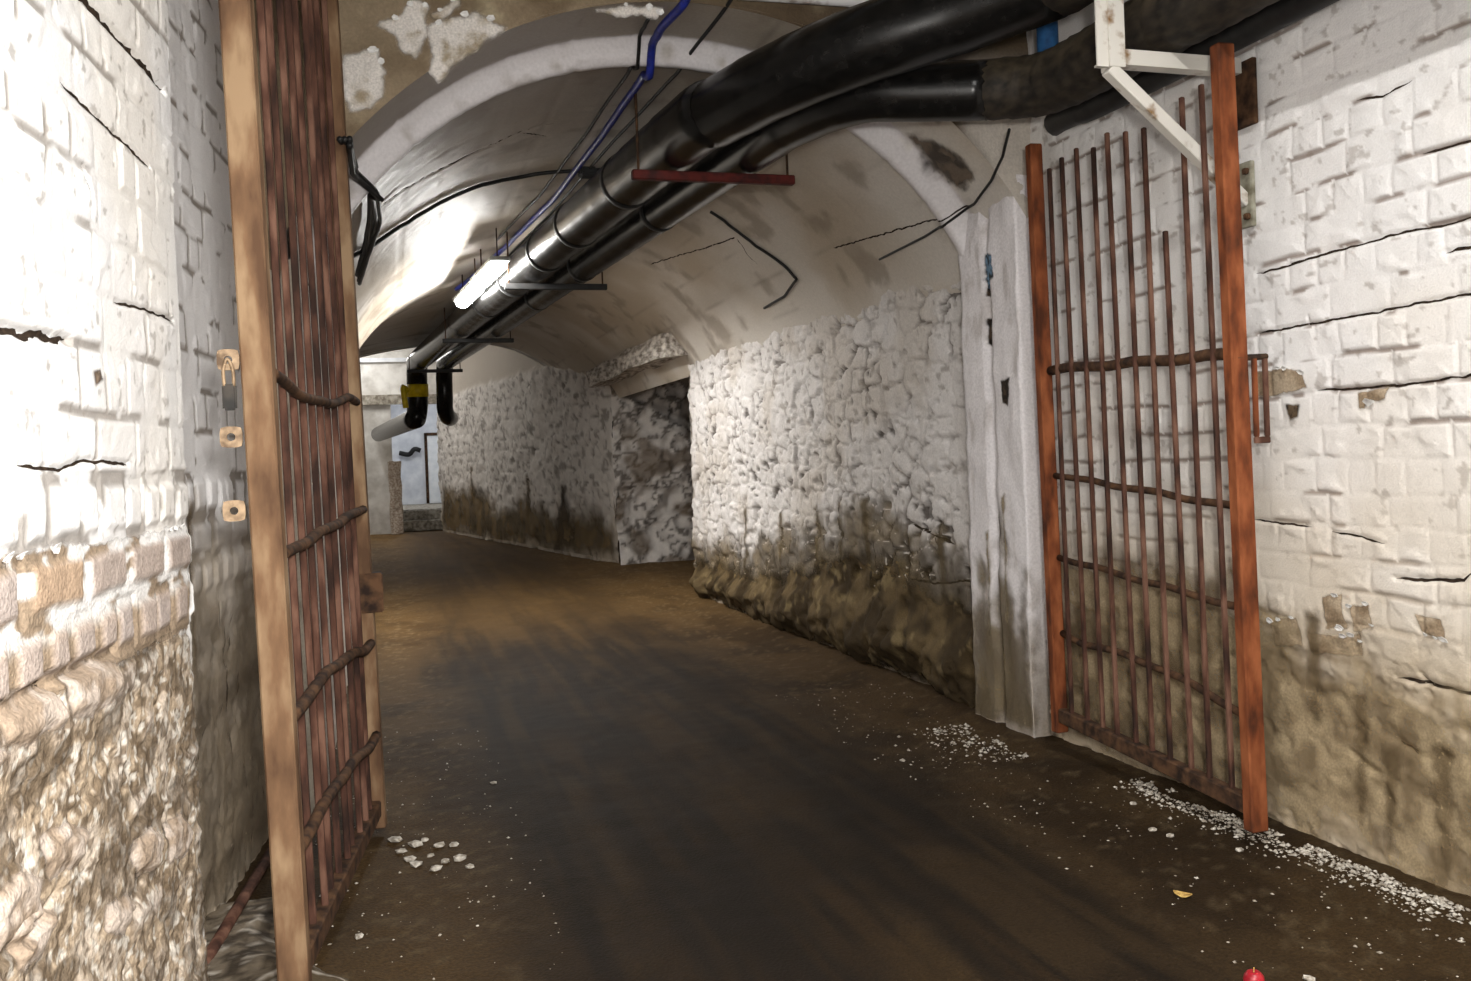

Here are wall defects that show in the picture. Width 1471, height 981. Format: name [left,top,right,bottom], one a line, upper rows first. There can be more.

peeling [342,46,385,111]
peeling [378,0,505,82]
crack [0,328,64,344]
leakage [443,467,613,553]
leakage [691,495,1036,728]
leakage [1061,559,1242,790]
leakage [1259,608,1471,897]